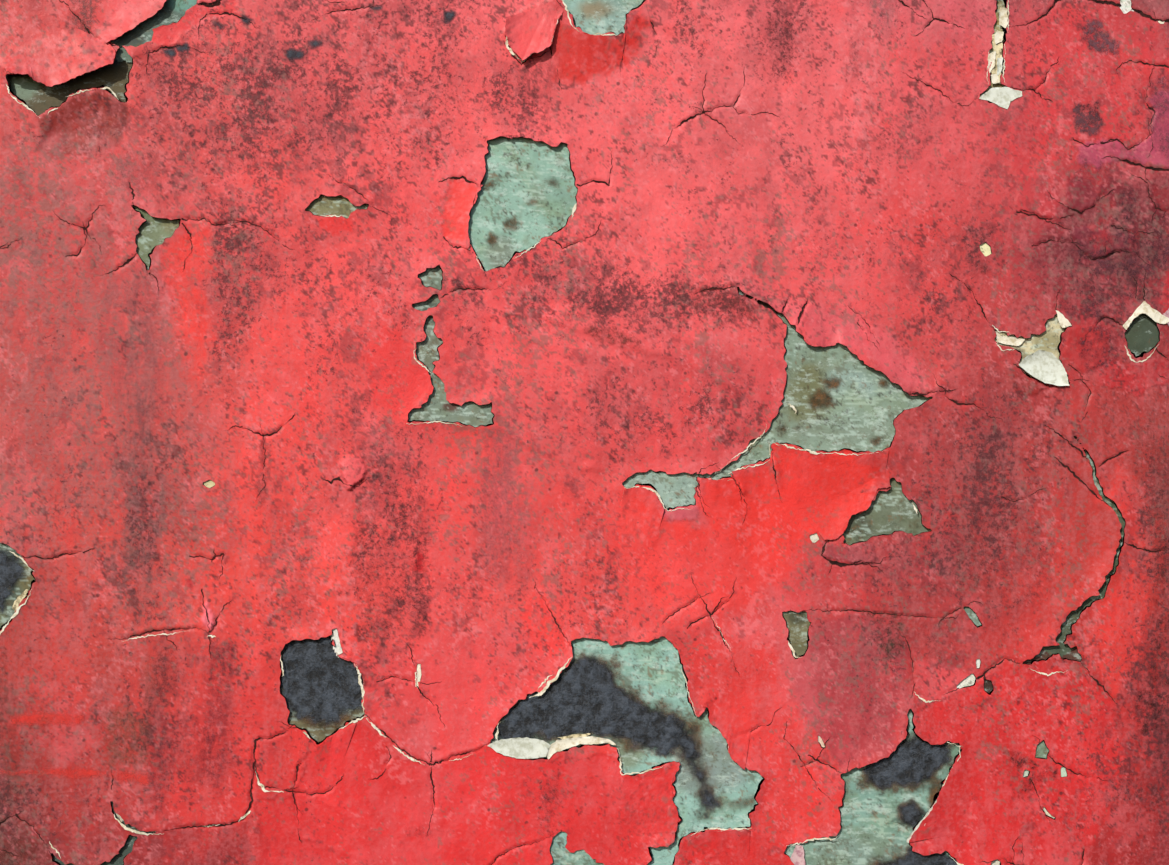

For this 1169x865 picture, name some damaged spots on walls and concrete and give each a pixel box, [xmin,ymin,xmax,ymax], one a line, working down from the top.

peeling [0,0,223,135]
peeling [505,0,661,85]
crack [899,0,969,36]
crack [1093,0,1169,24]
crack [1012,57,1169,300]
peeling [391,122,594,447]
peeling [606,313,951,563]
crack [945,316,1167,704]
crack [105,722,344,843]
peeling [263,624,384,776]
crack [366,640,489,835]
peeling [474,622,1020,865]